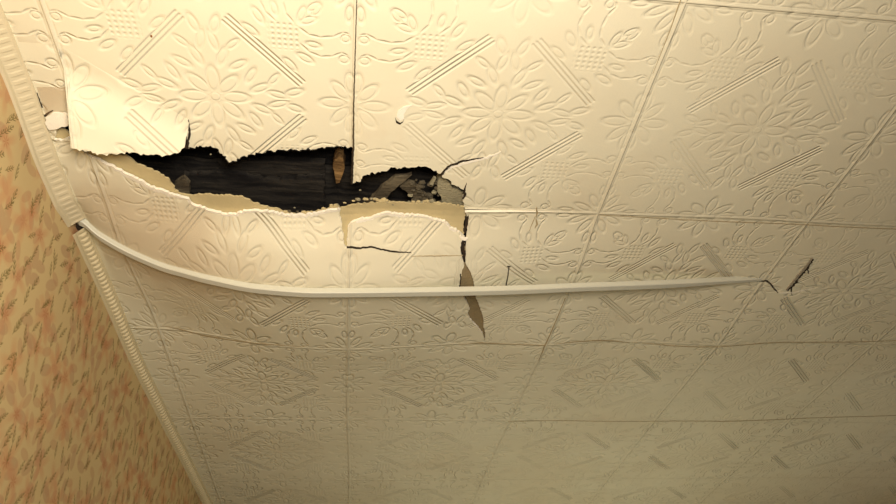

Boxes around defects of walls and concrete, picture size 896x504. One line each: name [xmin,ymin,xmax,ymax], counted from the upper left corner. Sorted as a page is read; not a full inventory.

crack [347,151,501,287]
crack [758,258,814,295]